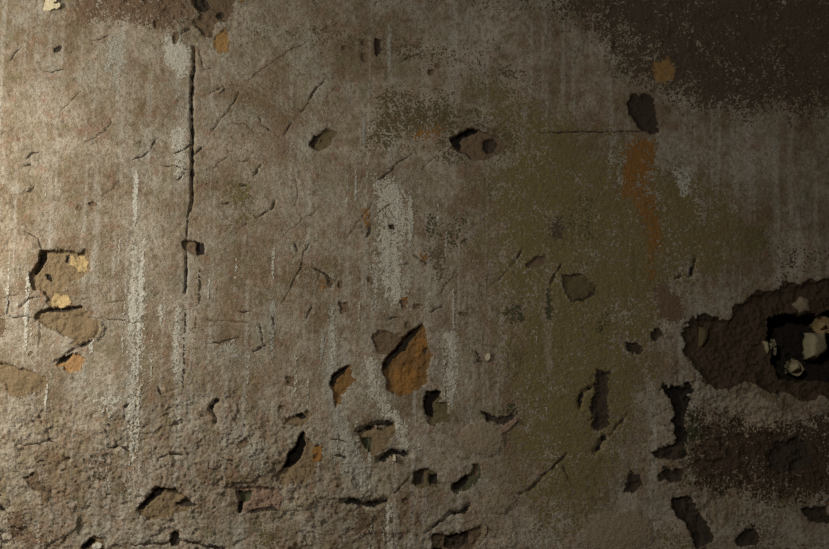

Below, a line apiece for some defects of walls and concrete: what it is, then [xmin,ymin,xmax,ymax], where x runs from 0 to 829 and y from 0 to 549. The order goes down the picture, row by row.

crack [165,28,326,293]
spalling [309,129,337,151]
spalling [450,128,505,161]
spalling [29,248,100,373]
crack [174,179,332,352]
spalling [330,365,356,406]
spalling [371,324,449,426]
spalling [662,382,694,446]
spalling [681,277,829,402]